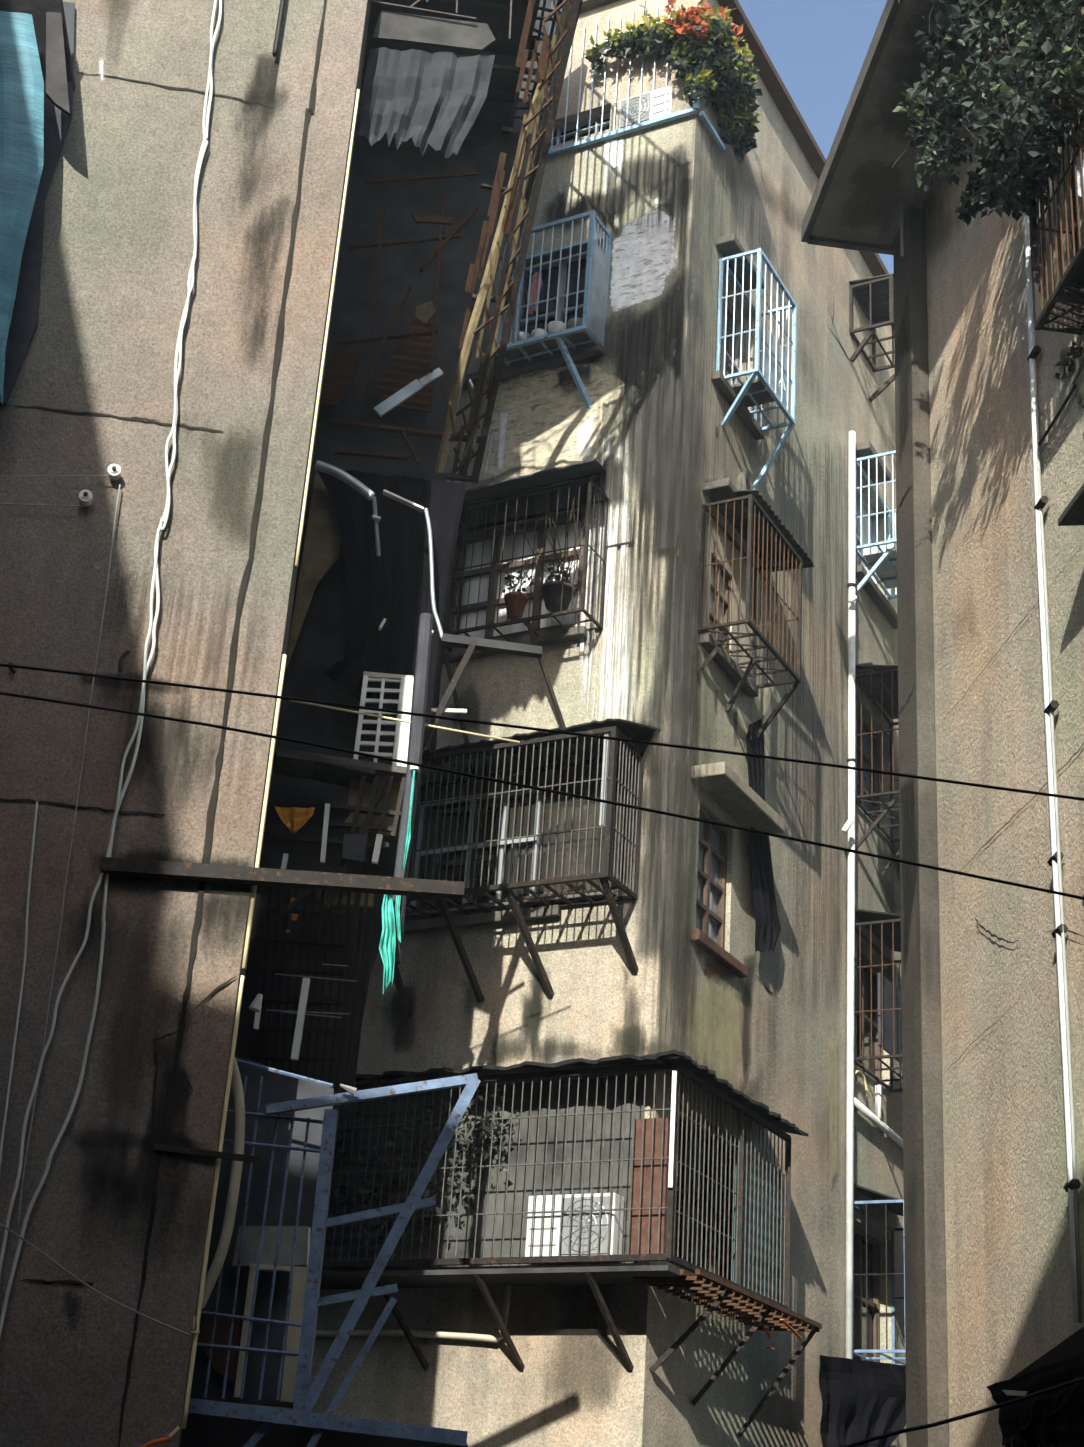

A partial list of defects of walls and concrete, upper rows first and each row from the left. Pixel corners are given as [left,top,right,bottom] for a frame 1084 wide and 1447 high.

crack [75,71,259,104]
crack [6,404,223,433]
leakage [486,413,507,469]
crack [151,0,326,1163]
leakage [547,140,846,1056]
crack [0,798,165,818]
leakage [99,849,248,867]
leakage [202,891,252,938]
leakage [492,973,579,1062]
leakage [72,1011,199,1249]
crack [18,1279,94,1287]
crack [118,1203,156,1447]